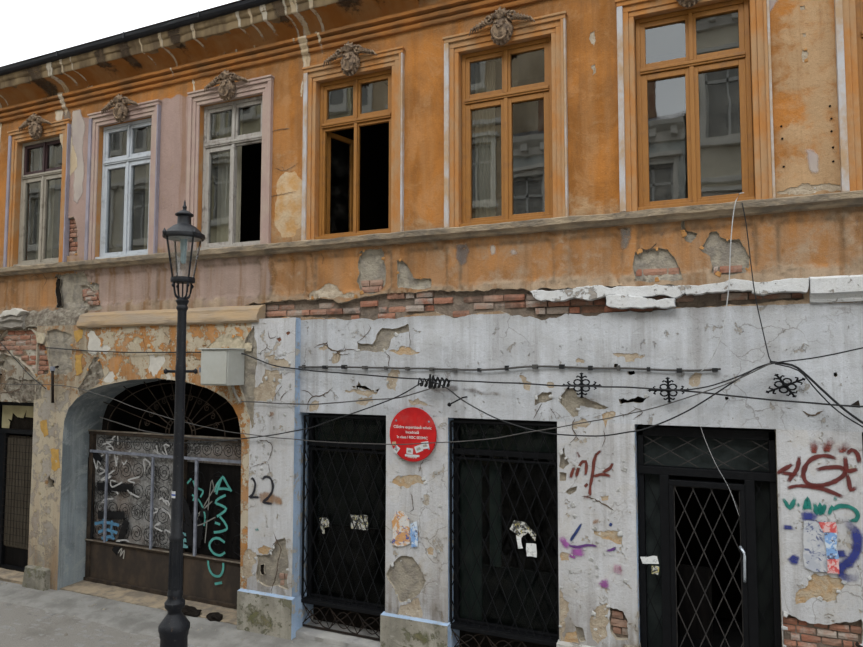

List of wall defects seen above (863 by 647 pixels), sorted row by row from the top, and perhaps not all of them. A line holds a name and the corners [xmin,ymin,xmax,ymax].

spalling [680,221,750,277]
spalling [245,247,804,355]
spalling [0,271,118,403]
peeling [126,333,171,380]
crack [314,328,371,356]
spalling [186,326,291,479]
spalling [519,375,649,518]
spalling [242,538,289,590]
spalling [386,555,438,618]
peeling [559,586,628,644]
peeling [795,573,847,604]
spalling [781,611,863,647]